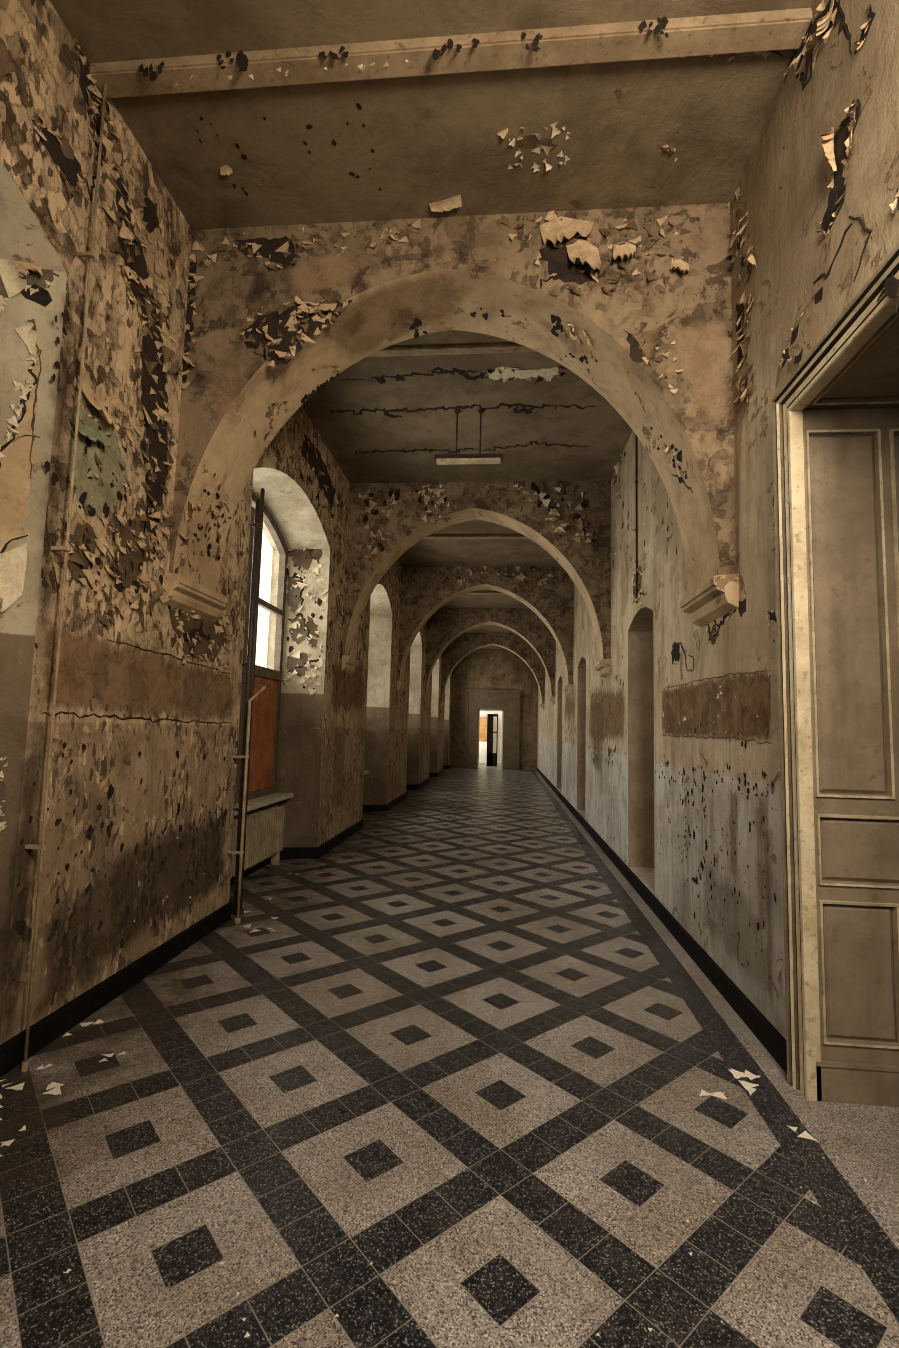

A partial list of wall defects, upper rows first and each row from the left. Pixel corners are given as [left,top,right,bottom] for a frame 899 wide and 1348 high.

spalling [432,38,480,60]
spalling [521,32,543,52]
spalling [638,17,669,38]
peeling [779,0,876,98]
peeling [497,122,571,173]
peeling [502,210,690,297]
peeling [779,99,872,367]
peeling [0,39,462,695]
leakage [42,568,232,724]
peeling [0,755,8,832]
leakage [3,756,38,1018]
leakage [41,819,225,1008]